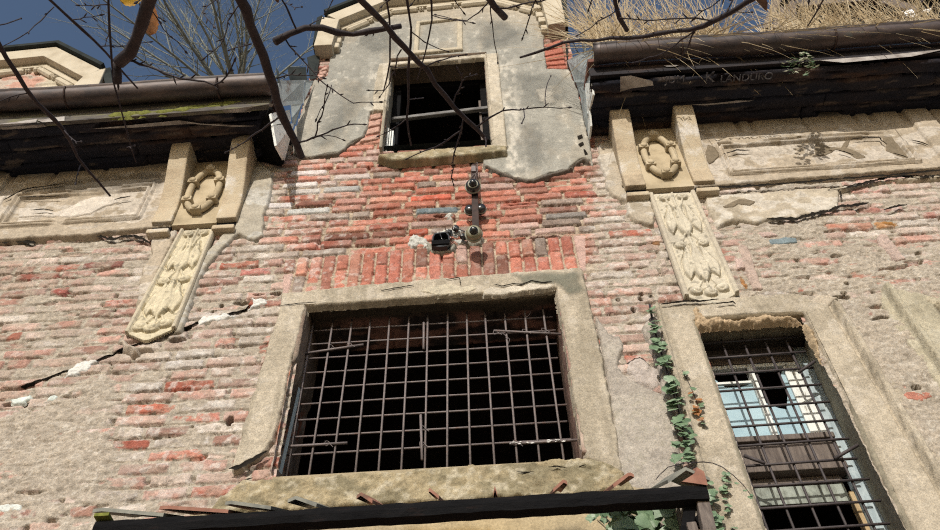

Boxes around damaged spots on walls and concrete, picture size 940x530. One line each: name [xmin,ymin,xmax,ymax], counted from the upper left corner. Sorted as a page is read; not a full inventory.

flaking render [545,41,567,69]
crack [718,136,940,221]
peeling [723,199,755,208]
crack [495,279,552,287]
crack [184,298,314,332]
spalling [692,307,822,365]
crack [21,343,141,389]